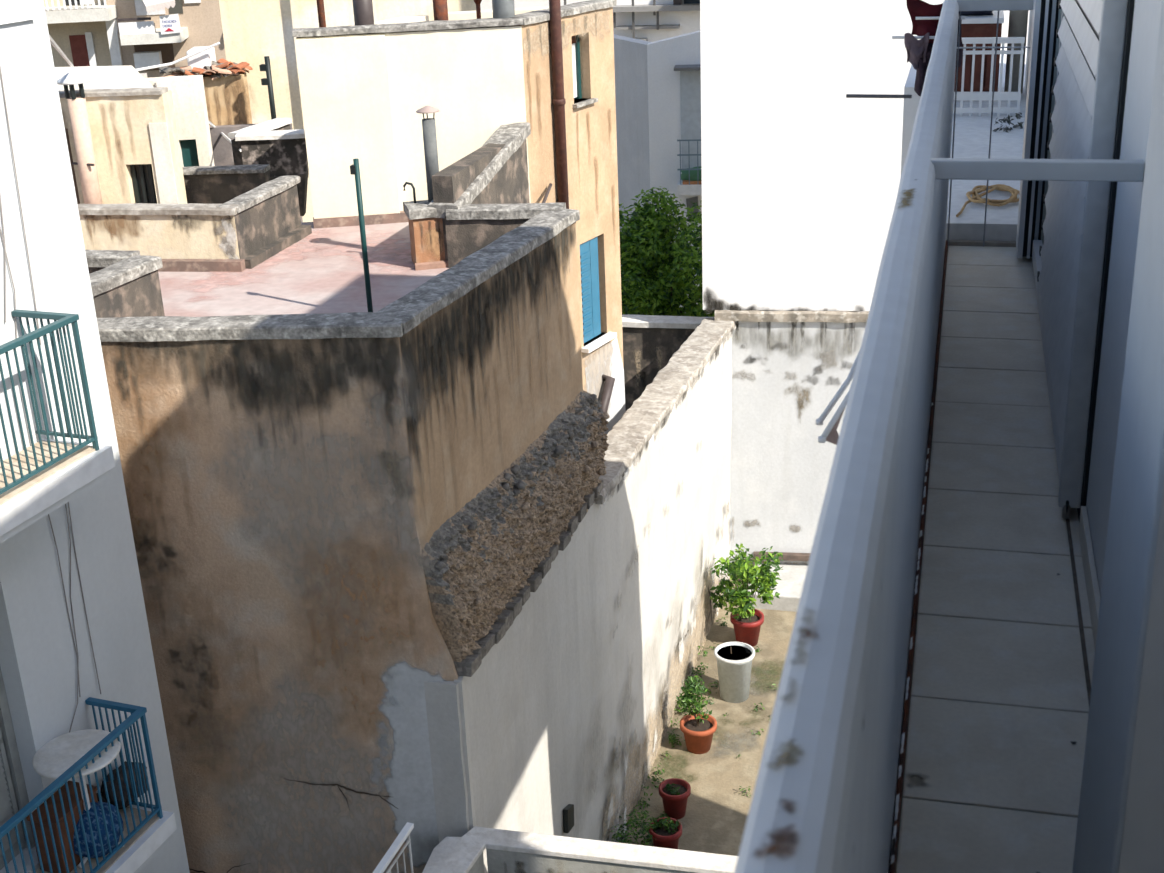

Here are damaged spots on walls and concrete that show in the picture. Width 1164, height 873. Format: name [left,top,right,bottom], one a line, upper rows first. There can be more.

damp [89,215,137,237]
damp [104,224,575,474]
spalling [416,327,736,677]
crack [284,778,398,810]
rust [755,800,797,856]